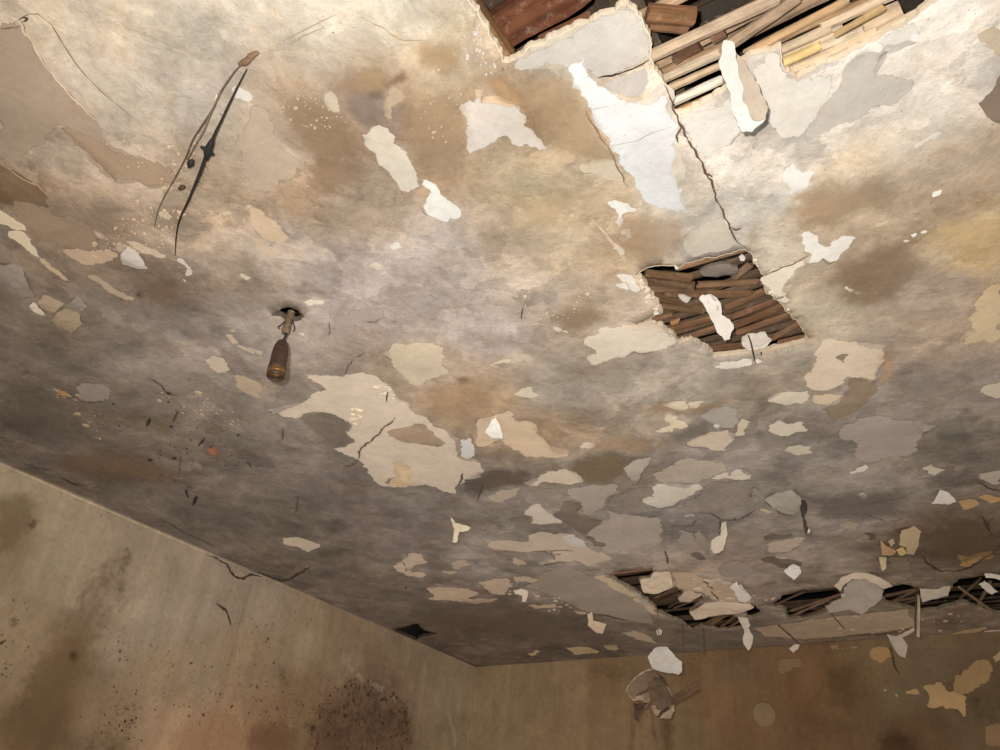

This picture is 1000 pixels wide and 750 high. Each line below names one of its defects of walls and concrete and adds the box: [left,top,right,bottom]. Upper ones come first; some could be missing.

peeling [362,80,461,222]
peeling [459,0,742,213]
crack [586,85,747,250]
peeling [741,0,938,144]
peeling [381,342,448,386]
peeling [584,218,855,369]
peeling [767,338,888,405]
peeling [266,372,1000,675]
water stain [150,623,410,750]
peeling [884,651,1000,717]